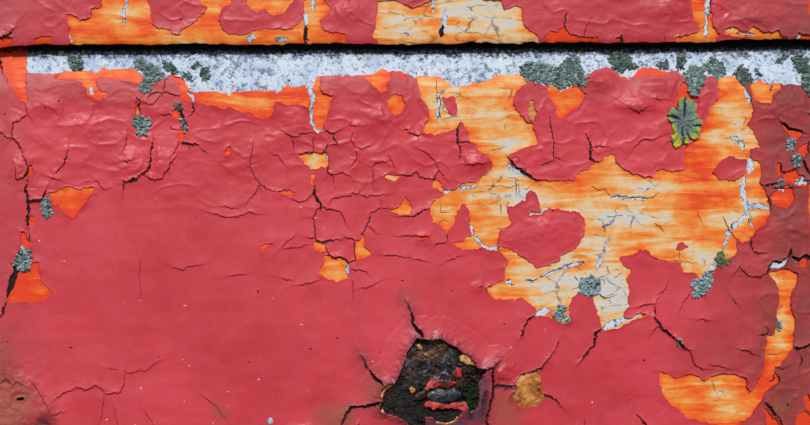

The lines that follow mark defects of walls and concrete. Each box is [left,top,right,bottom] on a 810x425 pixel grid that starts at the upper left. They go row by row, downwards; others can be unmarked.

peeling [66,0,346,45]
peeling [372,0,598,45]
peeling [675,0,810,43]
crack [0,110,67,317]
peeling [54,68,143,100]
crack [94,81,207,191]
crack [277,123,459,300]
crack [435,79,560,229]
peeling [416,73,810,331]
crack [723,217,810,278]
crack [341,356,384,425]
peeling [659,249,807,425]